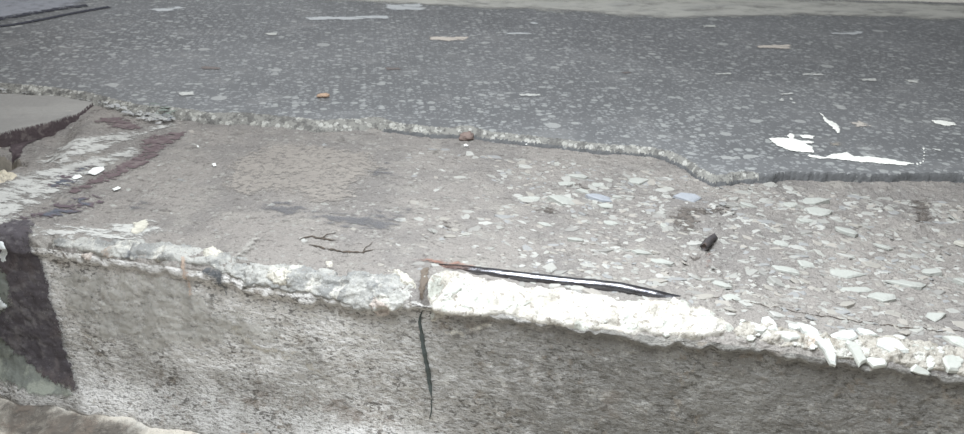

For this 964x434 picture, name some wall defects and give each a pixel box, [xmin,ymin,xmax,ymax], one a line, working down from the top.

crack [418,310,432,419]
spalling [0,75,964,376]